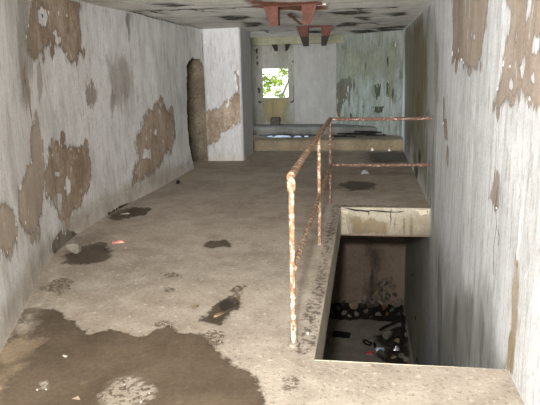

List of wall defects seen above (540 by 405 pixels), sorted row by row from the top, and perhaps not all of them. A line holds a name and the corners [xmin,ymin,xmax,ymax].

peeling [25,0,85,66]
peeling [451,0,488,77]
peeling [493,0,540,122]
peeling [0,62,92,261]
damp [109,207,151,220]
peeling [132,95,176,187]
damp [204,239,231,248]
peeling [206,70,241,145]
damp [340,181,377,191]
corrosion [351,218,386,235]
crack [346,208,403,226]
damp [0,242,266,405]